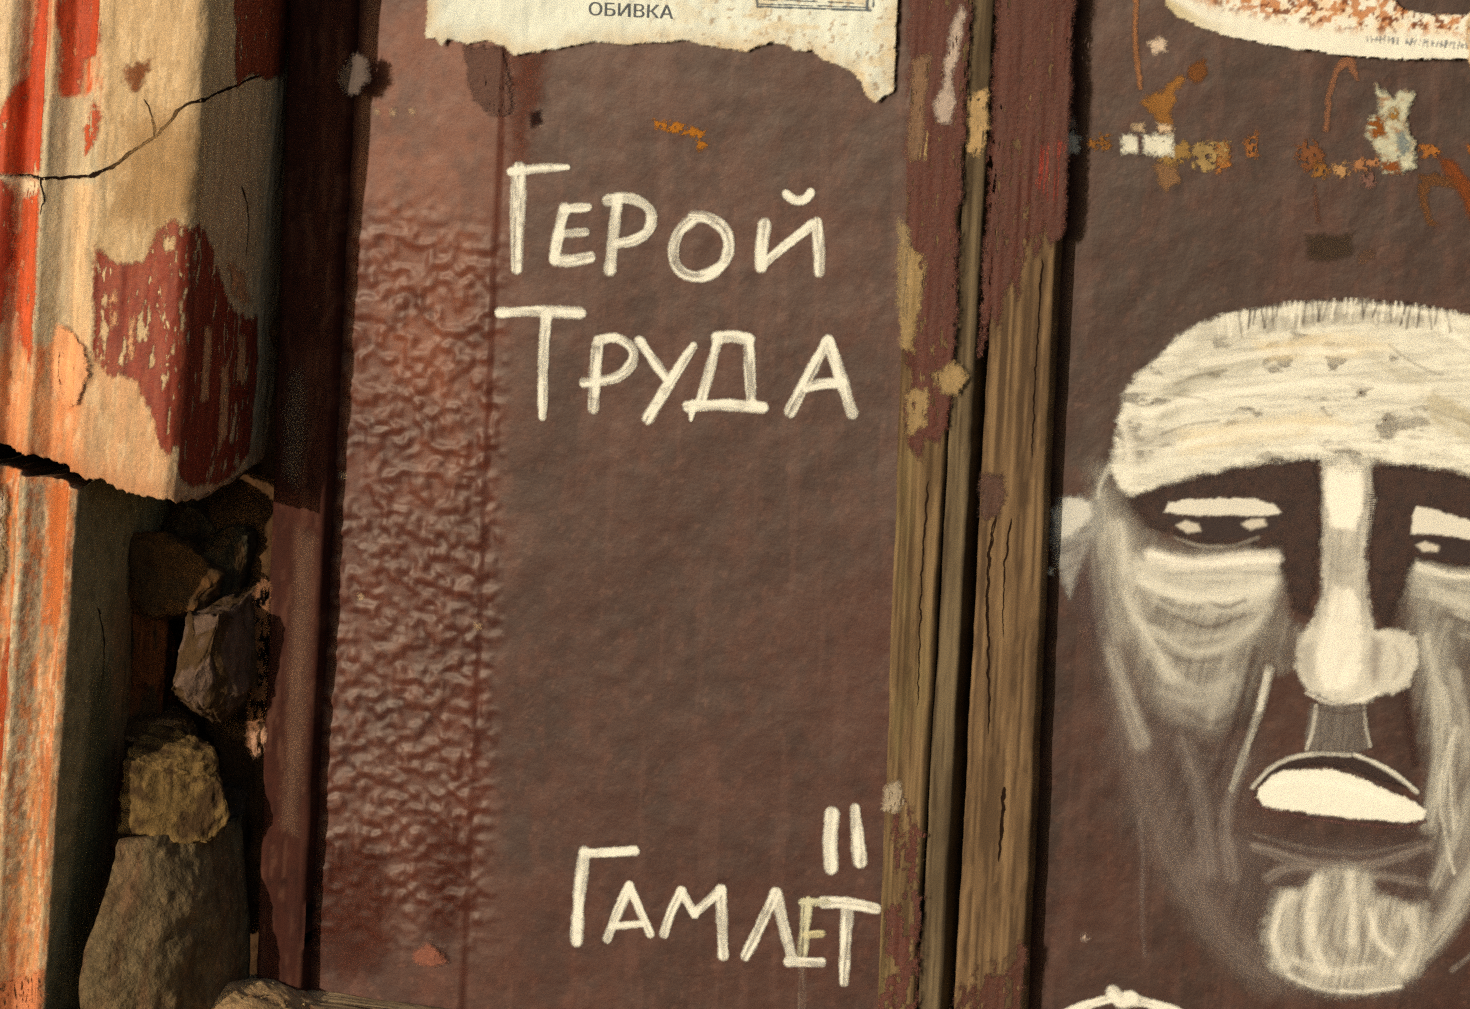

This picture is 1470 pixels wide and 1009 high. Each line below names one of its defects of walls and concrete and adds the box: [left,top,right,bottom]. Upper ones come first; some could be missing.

peeling [234,0,289,85]
crack [0,69,275,214]
peeling [0,0,259,487]
spalling [0,969,45,1009]